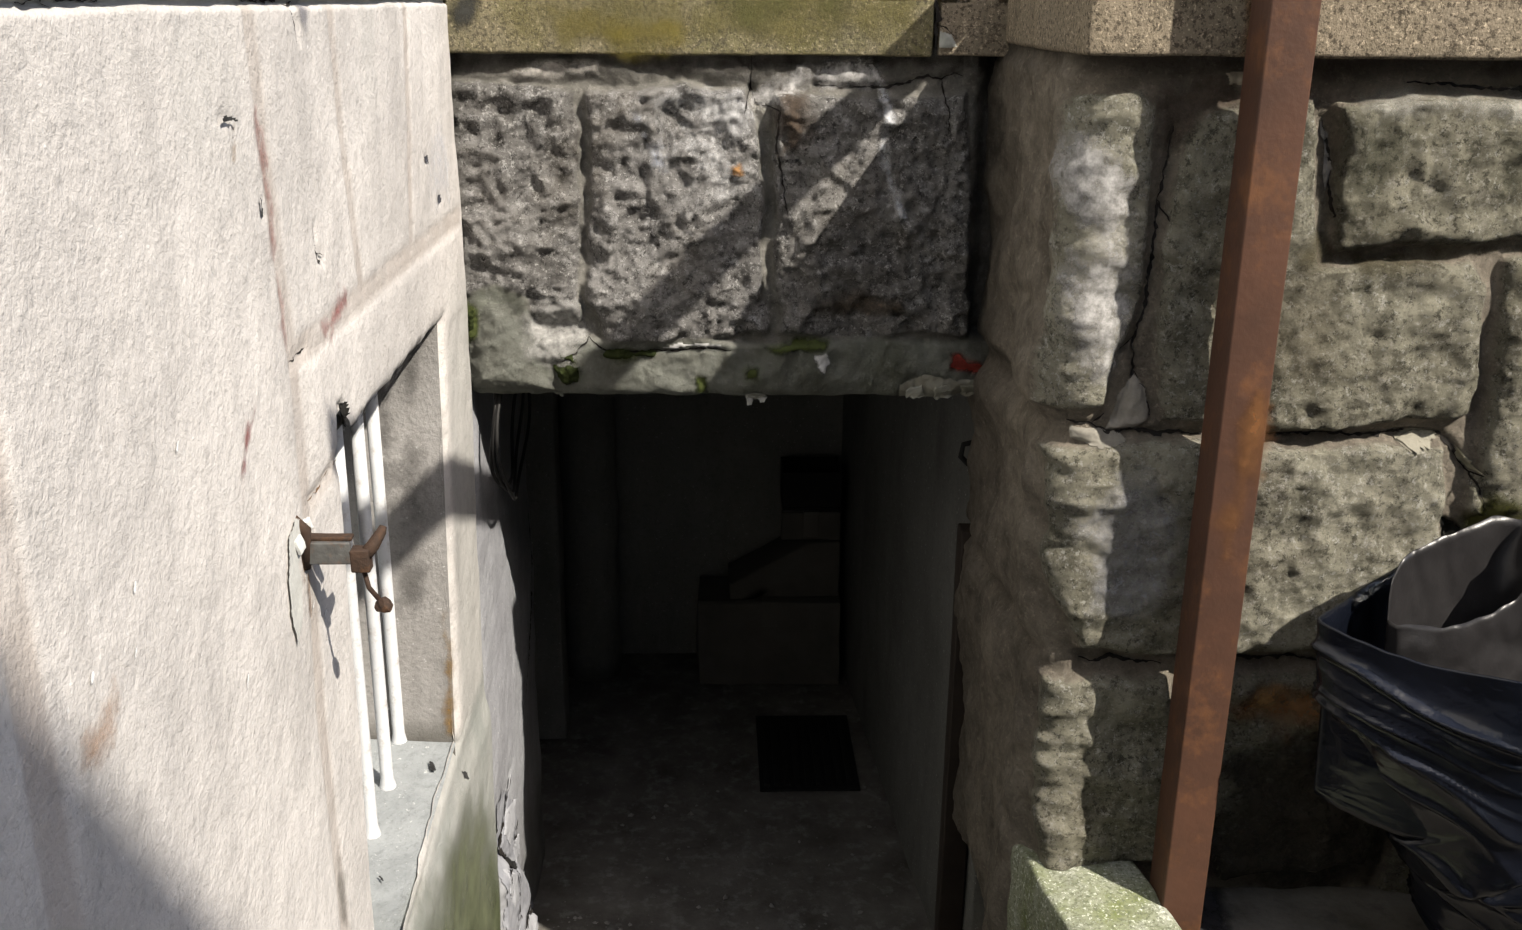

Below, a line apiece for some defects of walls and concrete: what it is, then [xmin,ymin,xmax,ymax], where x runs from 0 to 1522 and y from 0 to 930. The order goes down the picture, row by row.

crack [743,55,788,213]
crack [815,0,962,134]
crack [1407,80,1522,92]
water stain [526,302,587,363]
crack [1066,126,1201,436]
peeling [496,790,538,930]